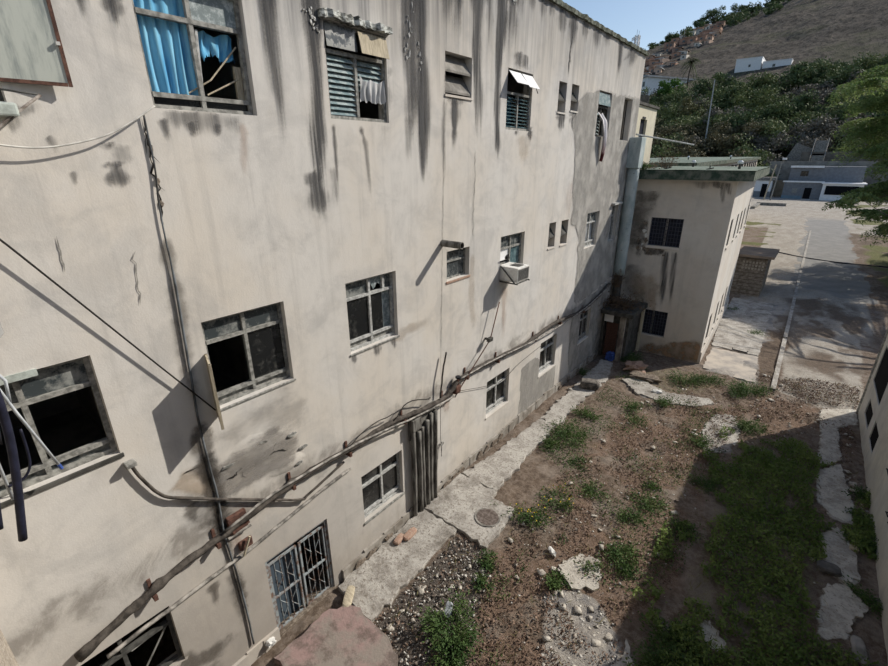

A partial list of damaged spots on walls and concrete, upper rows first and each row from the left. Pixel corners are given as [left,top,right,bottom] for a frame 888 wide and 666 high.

damp [533,0,601,45]
damp [162,111,200,135]
damp [260,0,283,108]
damp [302,0,338,209]
damp [402,0,430,175]
damp [458,0,518,148]
damp [107,161,127,184]
damp [631,191,656,244]
crack [56,236,65,271]
crack [131,253,141,301]
damp [661,252,677,297]
damp [192,425,308,534]